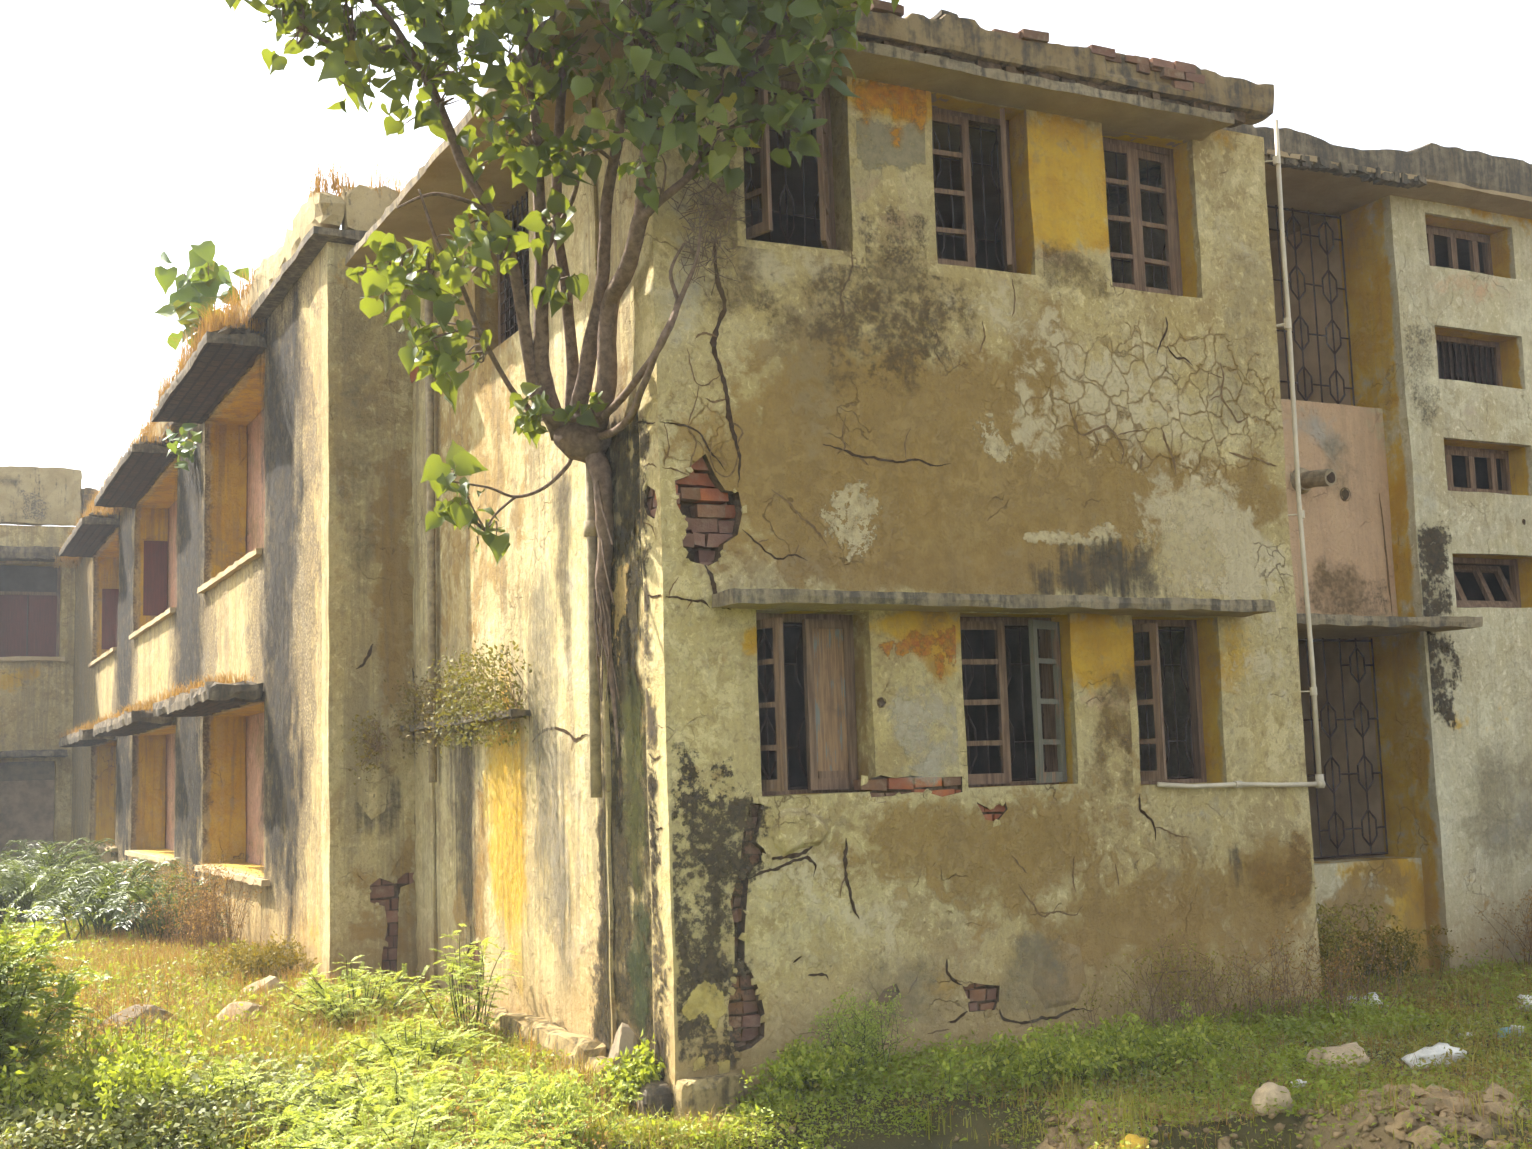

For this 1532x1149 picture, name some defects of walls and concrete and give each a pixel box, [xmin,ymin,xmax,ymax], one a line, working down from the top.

crack [633,241,827,560]
crack [823,416,951,467]
spalling [639,457,747,566]
peeling [820,481,882,562]
leakage [259,281,304,947]
leakage [1418,521,1462,730]
leakage [589,414,773,1081]
spalling [853,774,967,803]
spalling [367,872,416,979]
crack [751,838,859,918]
spalling [693,968,770,1074]
crack [879,960,1092,1046]